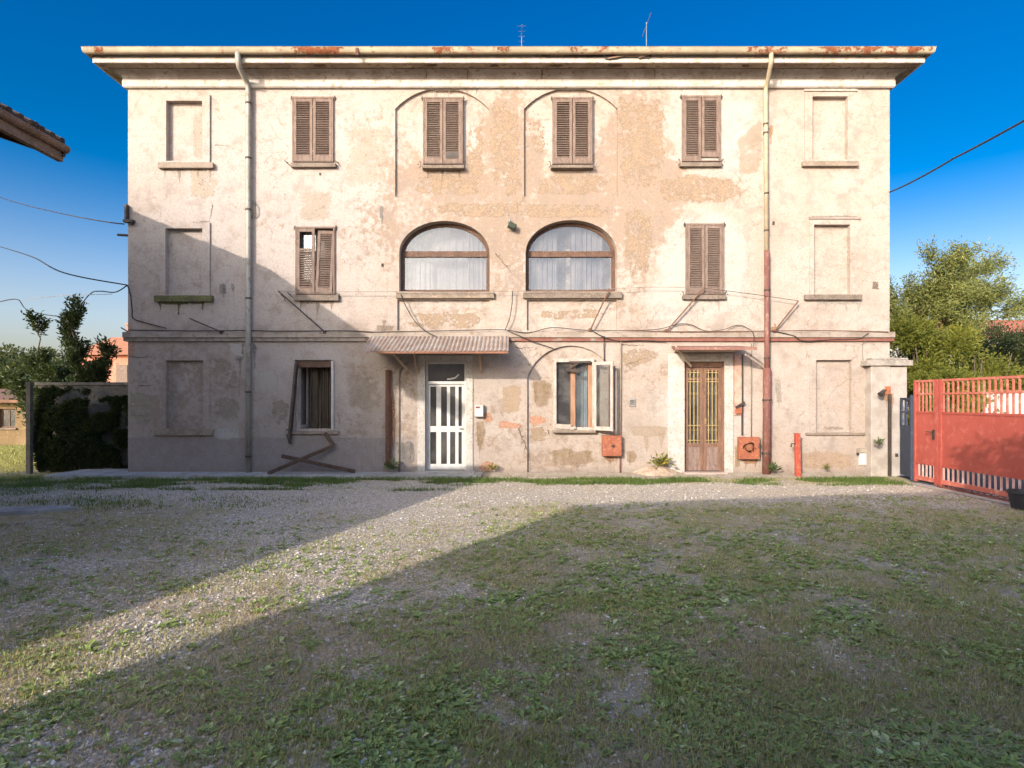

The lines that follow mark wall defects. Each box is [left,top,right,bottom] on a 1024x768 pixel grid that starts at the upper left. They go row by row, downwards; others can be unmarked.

rust [818,47,885,58]
flaking render [417,106,608,218]
flaking render [617,97,741,203]
flaking render [624,209,652,279]
flaking render [409,310,479,329]
flaking render [542,309,603,319]
flaking render [623,348,658,369]
flaking render [483,386,547,443]